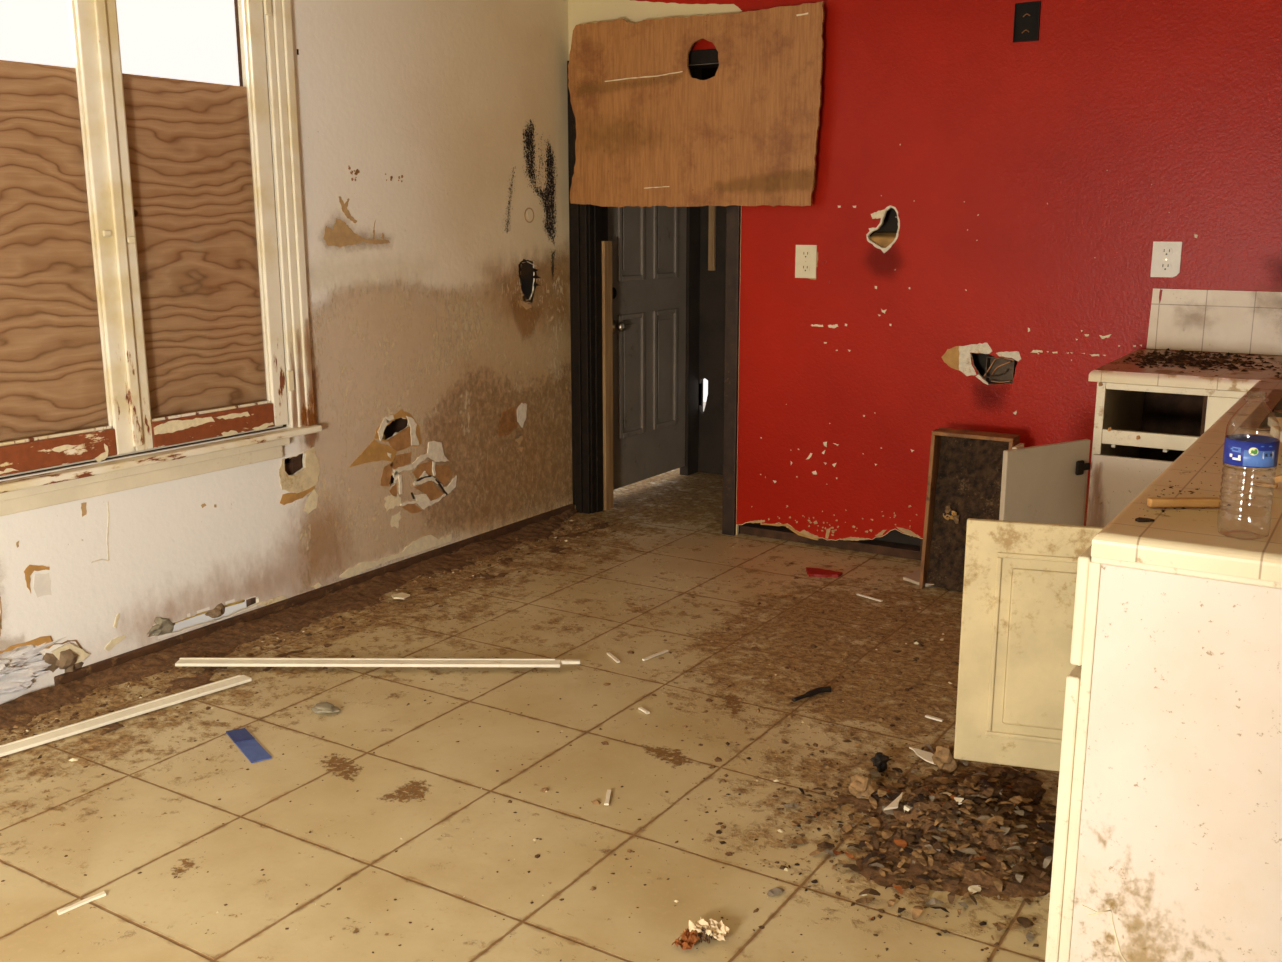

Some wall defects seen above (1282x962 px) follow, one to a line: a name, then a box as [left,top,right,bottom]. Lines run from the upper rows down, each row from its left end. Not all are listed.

peeling [323,196,390,247]
spalling [866,195,900,253]
spalling [518,259,541,310]
spalling [942,330,1142,385]
peeling [154,412,274,436]
peeling [94,444,108,463]
spalling [349,410,457,528]
spalling [749,505,920,541]
spalling [0,636,90,695]